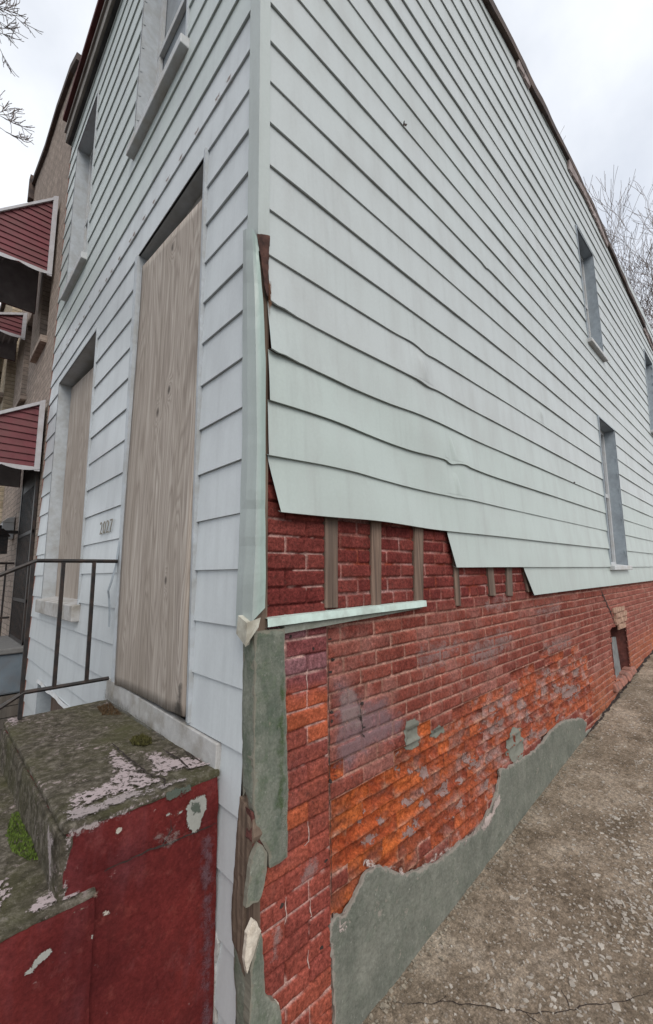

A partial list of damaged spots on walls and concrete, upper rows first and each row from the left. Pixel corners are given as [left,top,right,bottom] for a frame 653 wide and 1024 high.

peeling [26,825,79,912]
peeling [64,749,210,850]
flaking render [233,627,292,1024]
flaking render [320,644,653,1024]